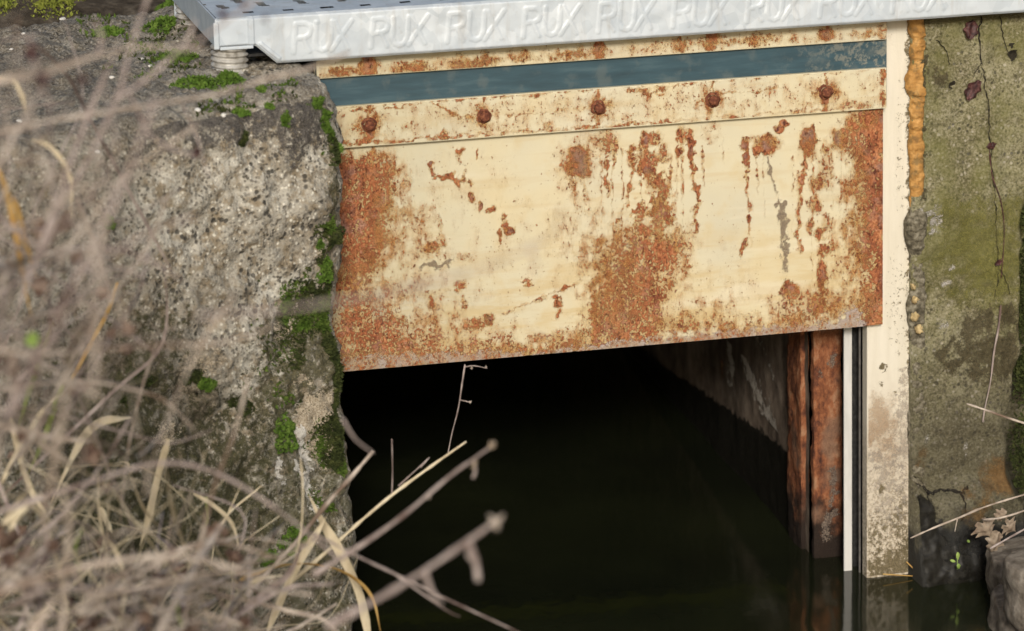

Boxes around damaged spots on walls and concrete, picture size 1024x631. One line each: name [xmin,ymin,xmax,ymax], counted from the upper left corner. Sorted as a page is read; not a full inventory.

corrosion [319,25,887,77]
corrosion [332,69,887,371]
water stain [767,156,790,279]
crack [973,16,1010,296]